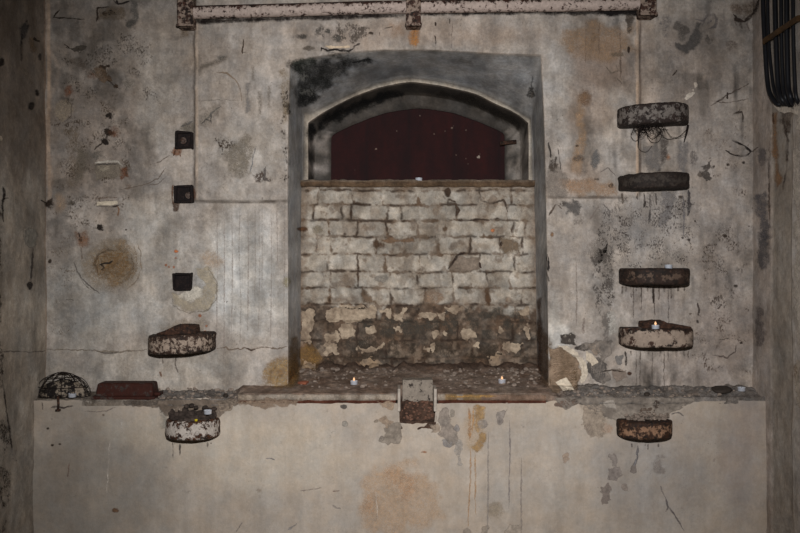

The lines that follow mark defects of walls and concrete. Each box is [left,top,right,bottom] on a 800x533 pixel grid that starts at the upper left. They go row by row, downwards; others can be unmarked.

water stain [543,10,637,82]
water stain [282,54,372,118]
water stain [545,92,696,334]
water stain [84,240,142,287]
peeling [299,308,315,344]
peeling [323,290,407,356]
peeling [356,342,385,368]
peeling [418,291,464,353]
peeling [460,328,480,348]
peeling [487,306,531,366]
spalling [546,333,695,437]
corrosion [448,395,495,474]